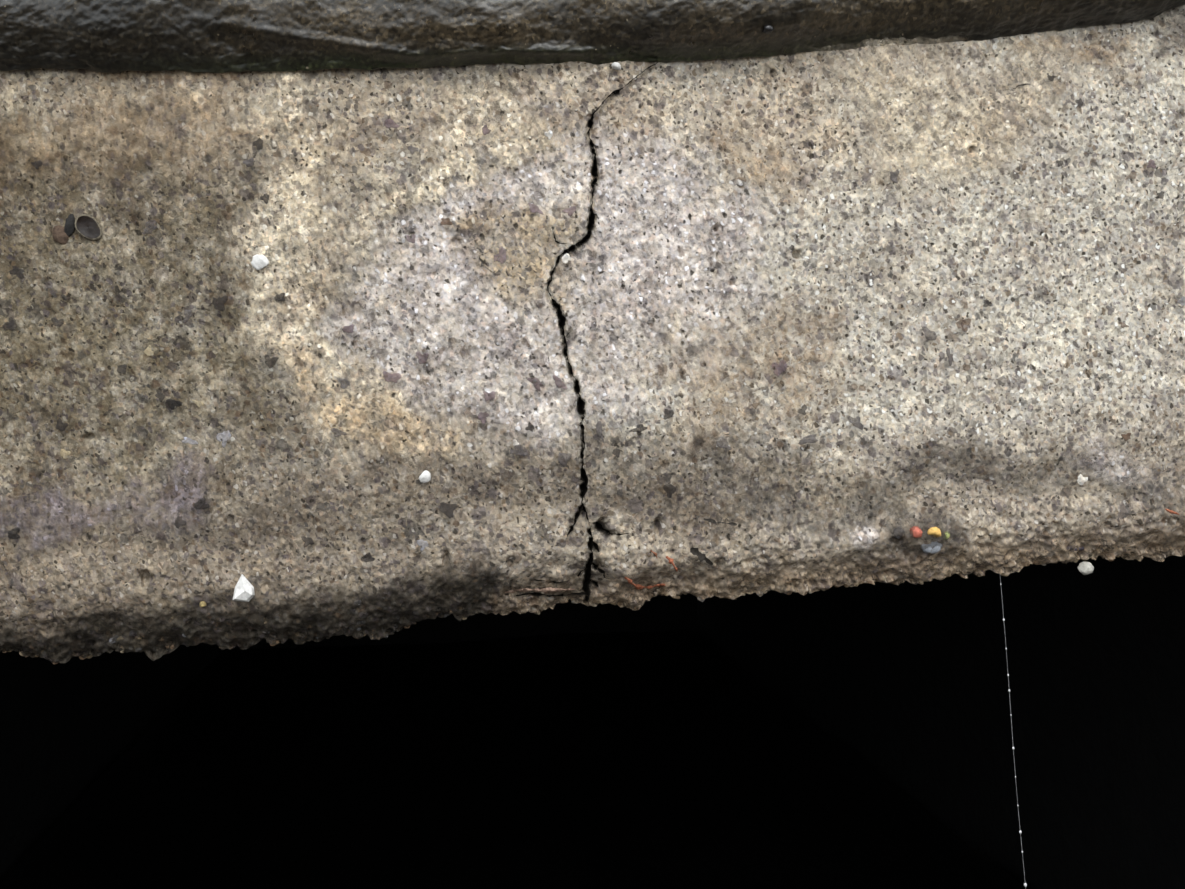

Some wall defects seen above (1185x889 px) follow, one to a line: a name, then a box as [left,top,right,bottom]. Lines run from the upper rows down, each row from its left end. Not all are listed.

crack [516,62,658,602]